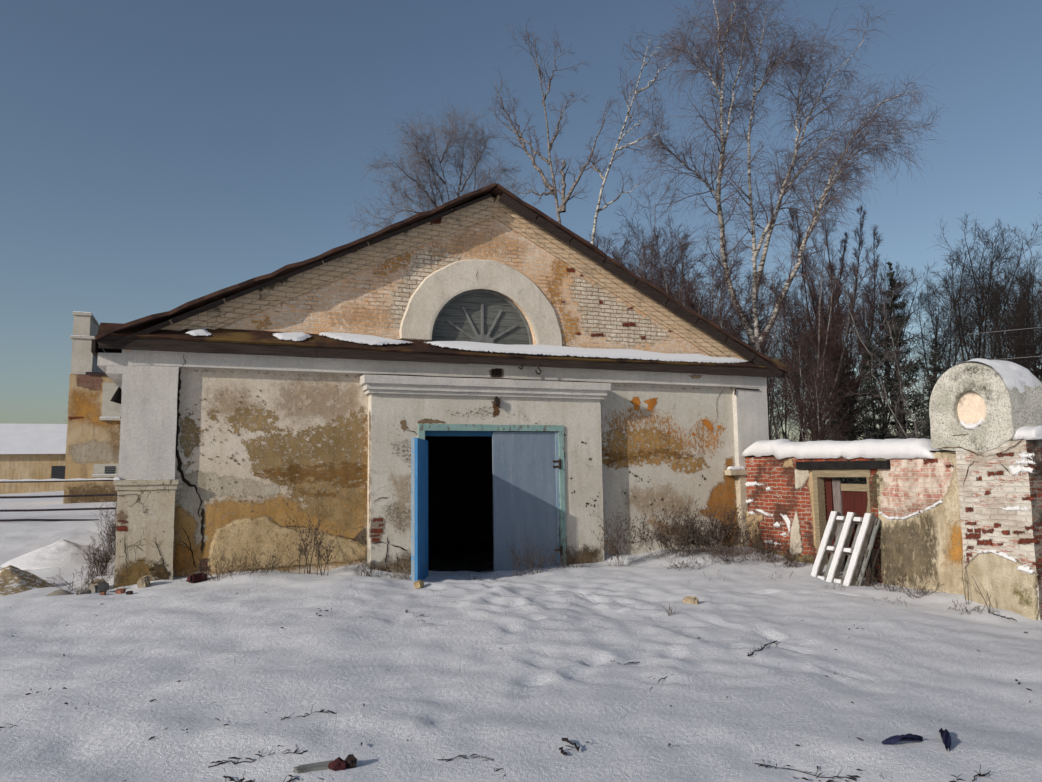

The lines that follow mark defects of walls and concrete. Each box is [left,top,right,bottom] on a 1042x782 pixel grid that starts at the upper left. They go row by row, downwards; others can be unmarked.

peeling [562,262,673,349]
leakage [72,393,121,450]
crack [119,354,204,577]
peeling [178,385,411,545]
peeling [589,396,727,486]
flaking render [870,457,955,517]
flaking render [965,506,1038,563]